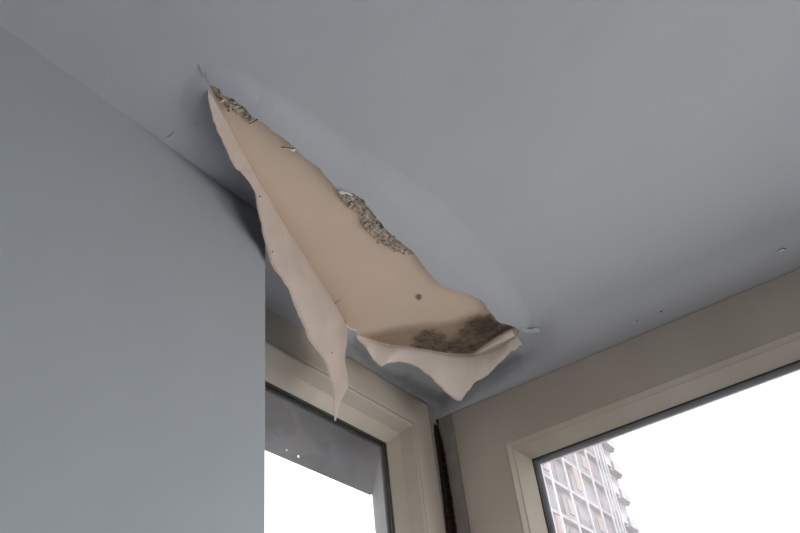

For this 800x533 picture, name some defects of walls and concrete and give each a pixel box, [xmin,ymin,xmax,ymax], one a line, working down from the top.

peeling [207,85,541,421]
damp [374,315,513,354]